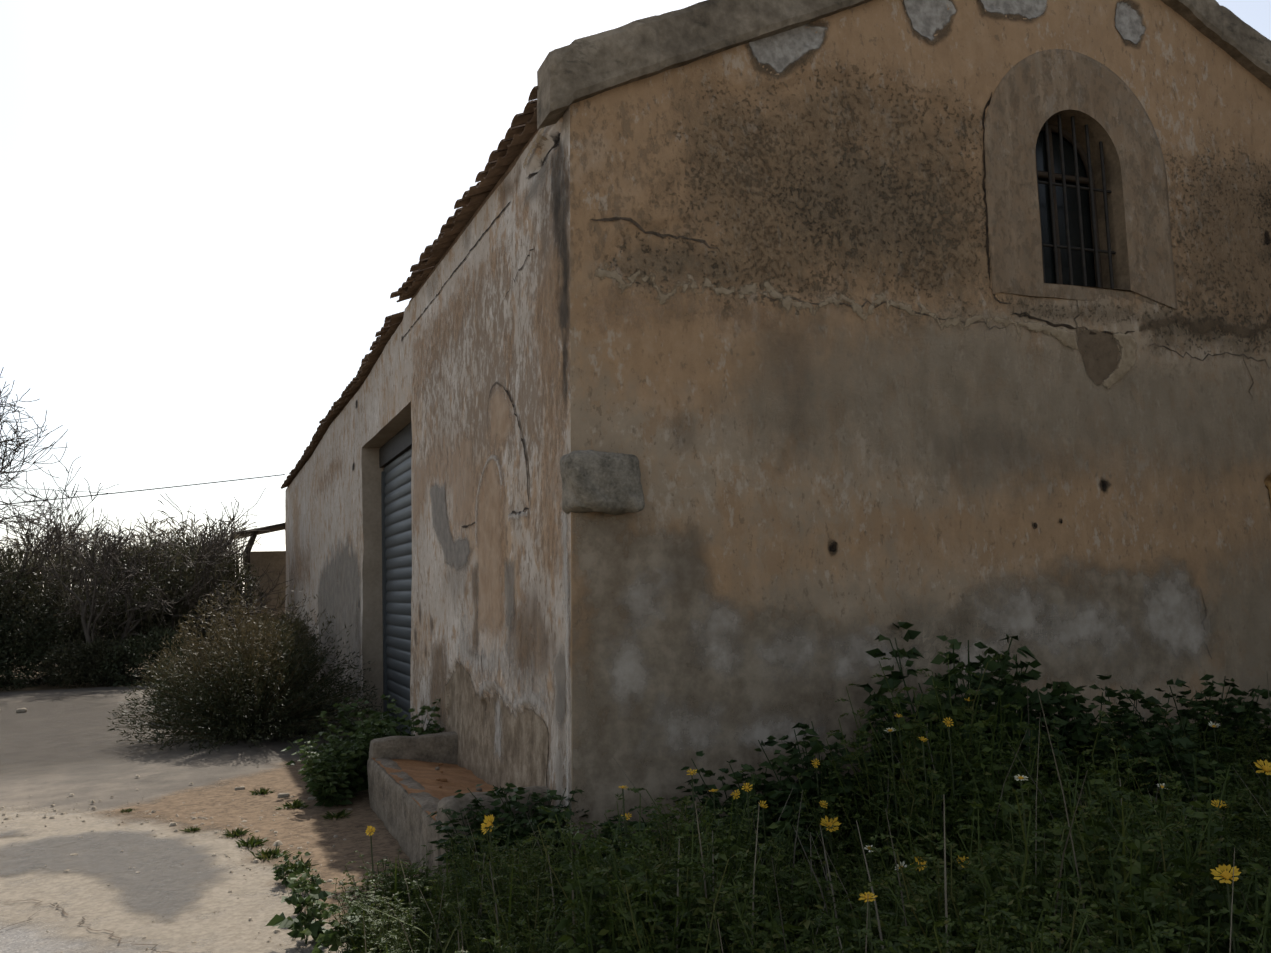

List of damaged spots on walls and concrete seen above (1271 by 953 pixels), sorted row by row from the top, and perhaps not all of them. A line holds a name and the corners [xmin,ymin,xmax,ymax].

flaking render [902,0,956,44]
flaking render [977,0,1047,21]
flaking render [1115,0,1146,48]
spalling [591,21,1271,389]
water stain [550,142,568,395]
crack [1149,343,1271,396]
water stain [561,512,1212,855]